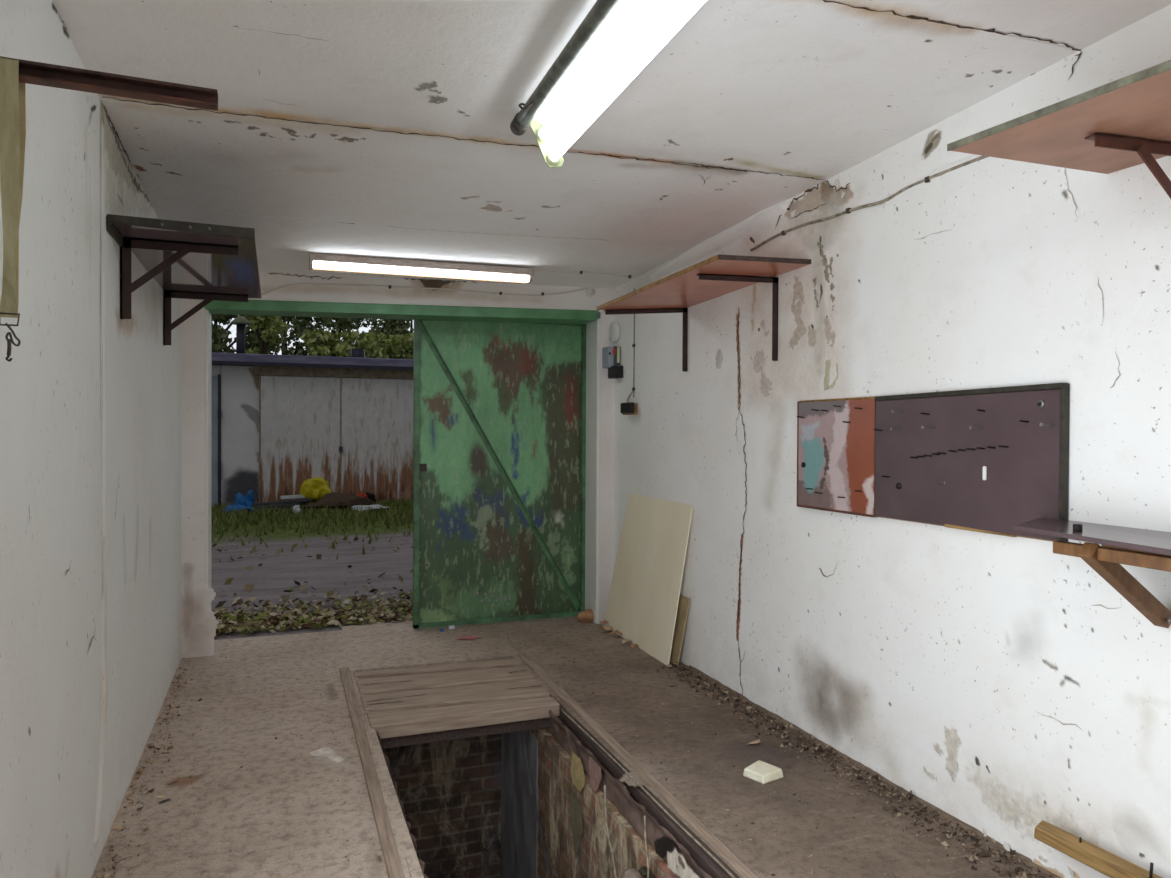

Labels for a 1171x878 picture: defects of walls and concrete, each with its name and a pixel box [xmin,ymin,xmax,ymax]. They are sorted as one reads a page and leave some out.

crack [823,0,1082,80]
peeling [219,120,366,144]
peeling [410,80,471,117]
crack [102,69,823,184]
damp [132,74,799,185]
flaking render [776,179,850,226]
peeling [786,235,844,391]
crack [733,310,747,696]